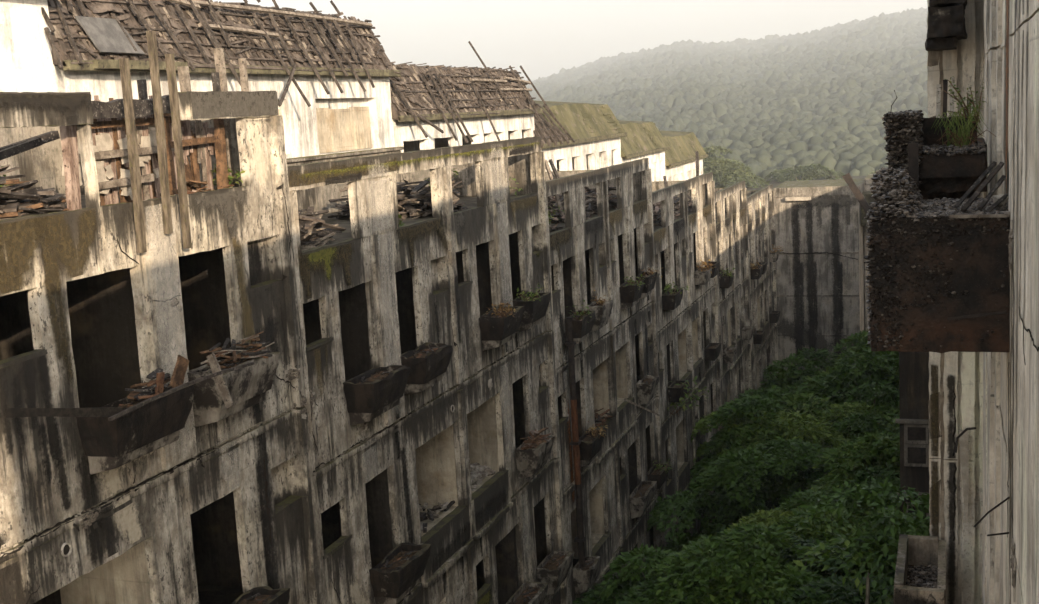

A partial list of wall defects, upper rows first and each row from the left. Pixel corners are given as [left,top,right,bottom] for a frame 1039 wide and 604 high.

leakage [288,158,400,187]
leakage [298,243,354,299]
leakage [770,195,857,359]
leakage [0,210,118,568]
leakage [395,404,413,543]
corrosion [567,399,581,502]
crack [1007,314,1039,538]
leakage [0,536,36,604]